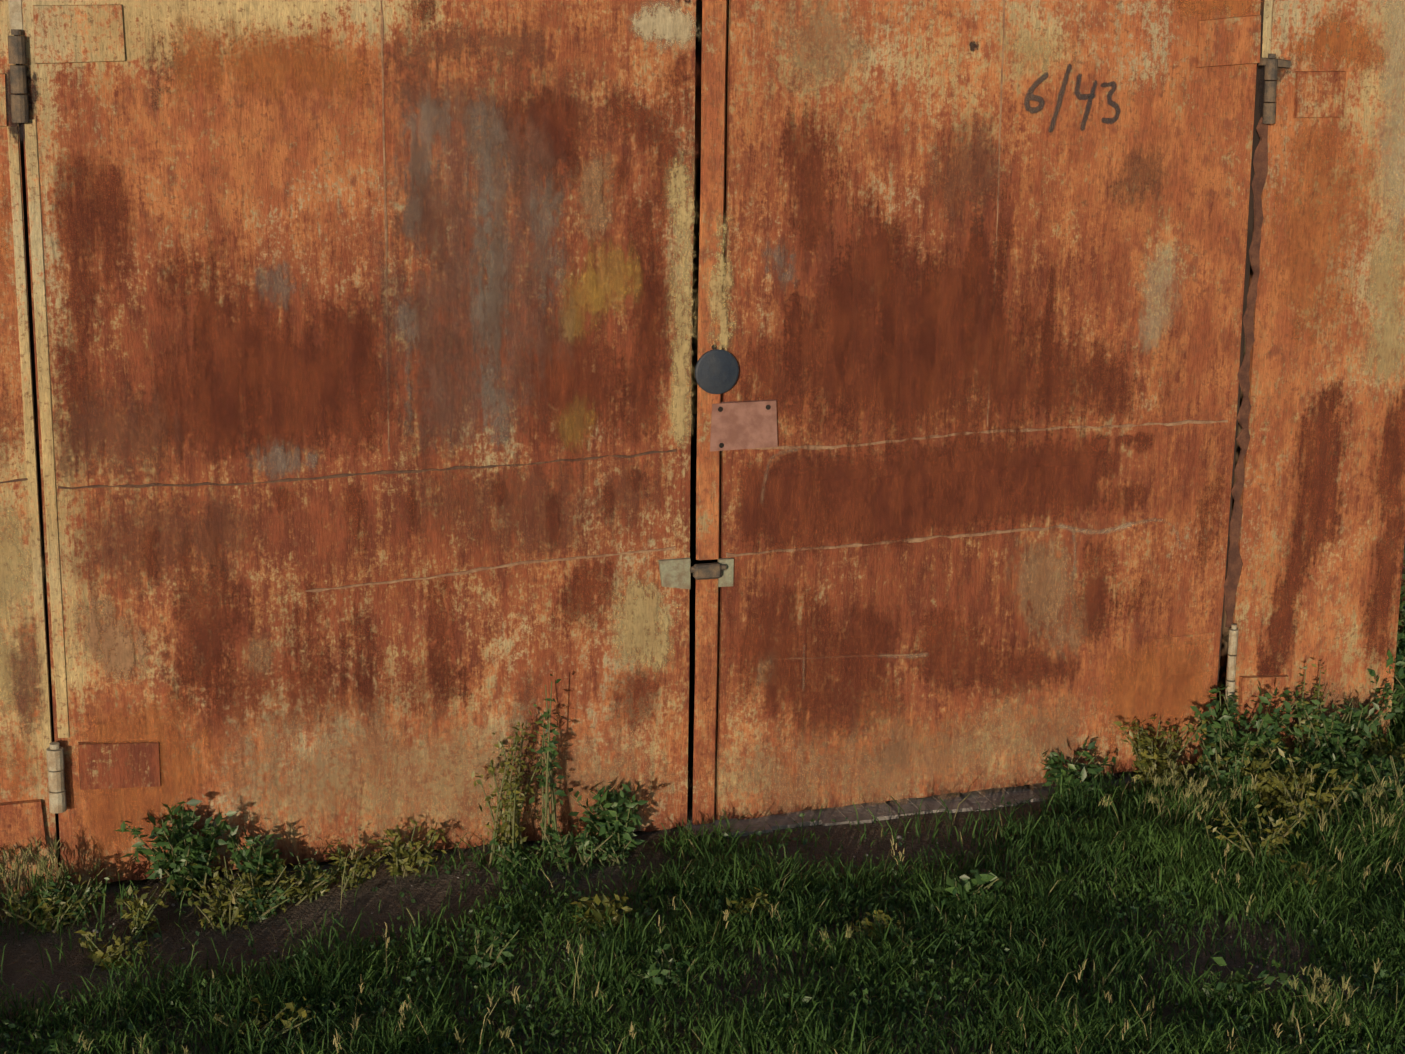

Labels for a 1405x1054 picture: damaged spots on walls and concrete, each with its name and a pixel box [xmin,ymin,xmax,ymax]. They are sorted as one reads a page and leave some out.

corrosion [413,0,435,21]
corrosion [1289,15,1389,72]
corrosion [607,56,695,438]
corrosion [55,157,128,452]
corrosion [1257,383,1347,676]
corrosion [1362,392,1405,661]
corrosion [10,617,43,730]
corrosion [166,506,250,707]
corrosion [341,613,377,694]
corrosion [562,562,613,630]
corrosion [914,610,1079,697]
corrosion [1075,543,1142,641]